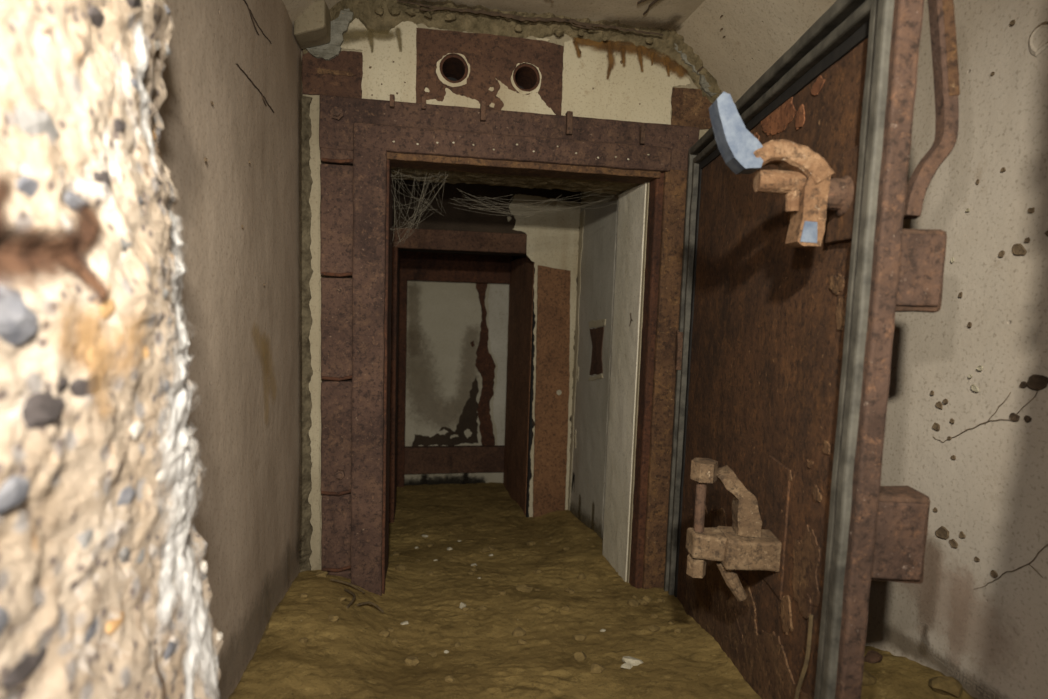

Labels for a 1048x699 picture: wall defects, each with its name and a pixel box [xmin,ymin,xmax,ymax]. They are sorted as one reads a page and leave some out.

crack [243,0,272,44]
crack [397,0,663,36]
crack [235,63,274,113]
corrosion [754,75,826,140]
spalling [299,0,723,572]
spalling [0,0,223,699]
crack [933,391,1038,442]
corrosion [704,505,727,528]
corrosion [684,524,821,699]